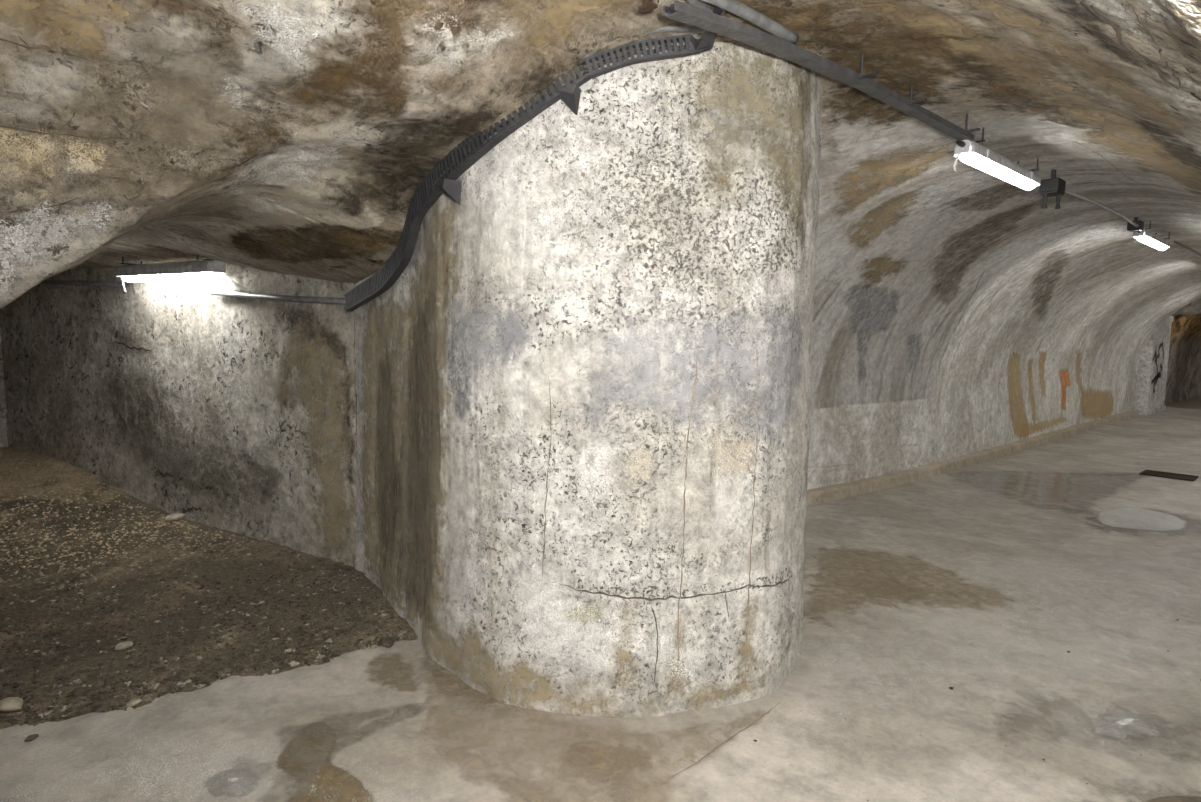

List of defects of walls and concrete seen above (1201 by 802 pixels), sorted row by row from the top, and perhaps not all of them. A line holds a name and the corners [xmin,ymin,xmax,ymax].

leakage [0,0,138,59]
leakage [81,0,632,268]
leakage [688,0,1201,378]
leakage [0,202,1201,802]
crack [553,577,790,682]